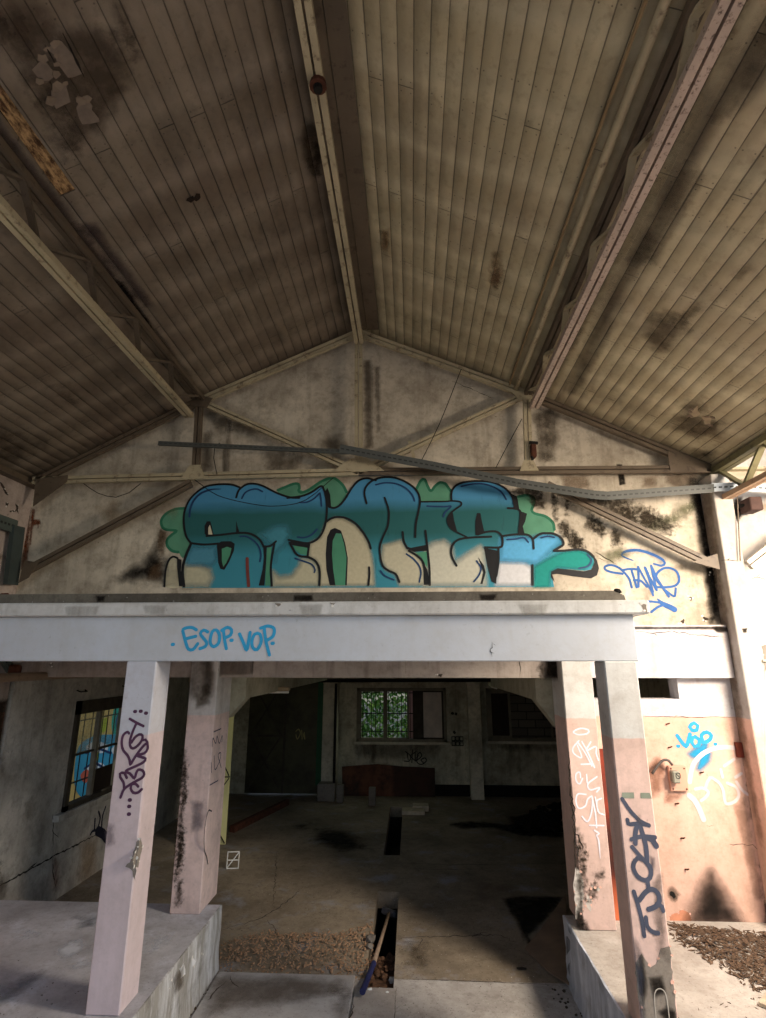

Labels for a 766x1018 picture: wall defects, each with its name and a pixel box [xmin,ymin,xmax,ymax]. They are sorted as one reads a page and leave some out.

leakage [0,13,120,145]
peeling [32,40,99,124]
leakage [512,488,705,560]
leakage [706,548,728,632]
leakage [175,751,187,906]
peeling [573,868,602,919]